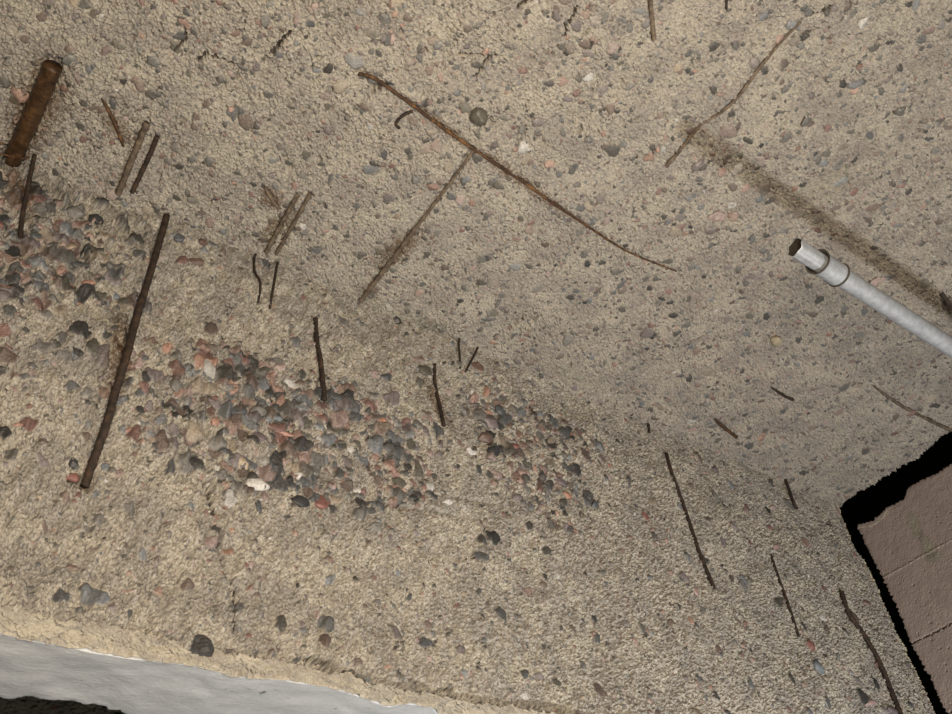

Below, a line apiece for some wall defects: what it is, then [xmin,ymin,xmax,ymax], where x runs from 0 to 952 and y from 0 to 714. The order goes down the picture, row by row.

spalling [3,59,62,238]
spalling [101,98,159,196]
spalling [264,187,312,255]
spalling [358,72,677,303]
spalling [61,213,170,489]
spalling [266,317,345,401]
spalling [433,363,446,427]